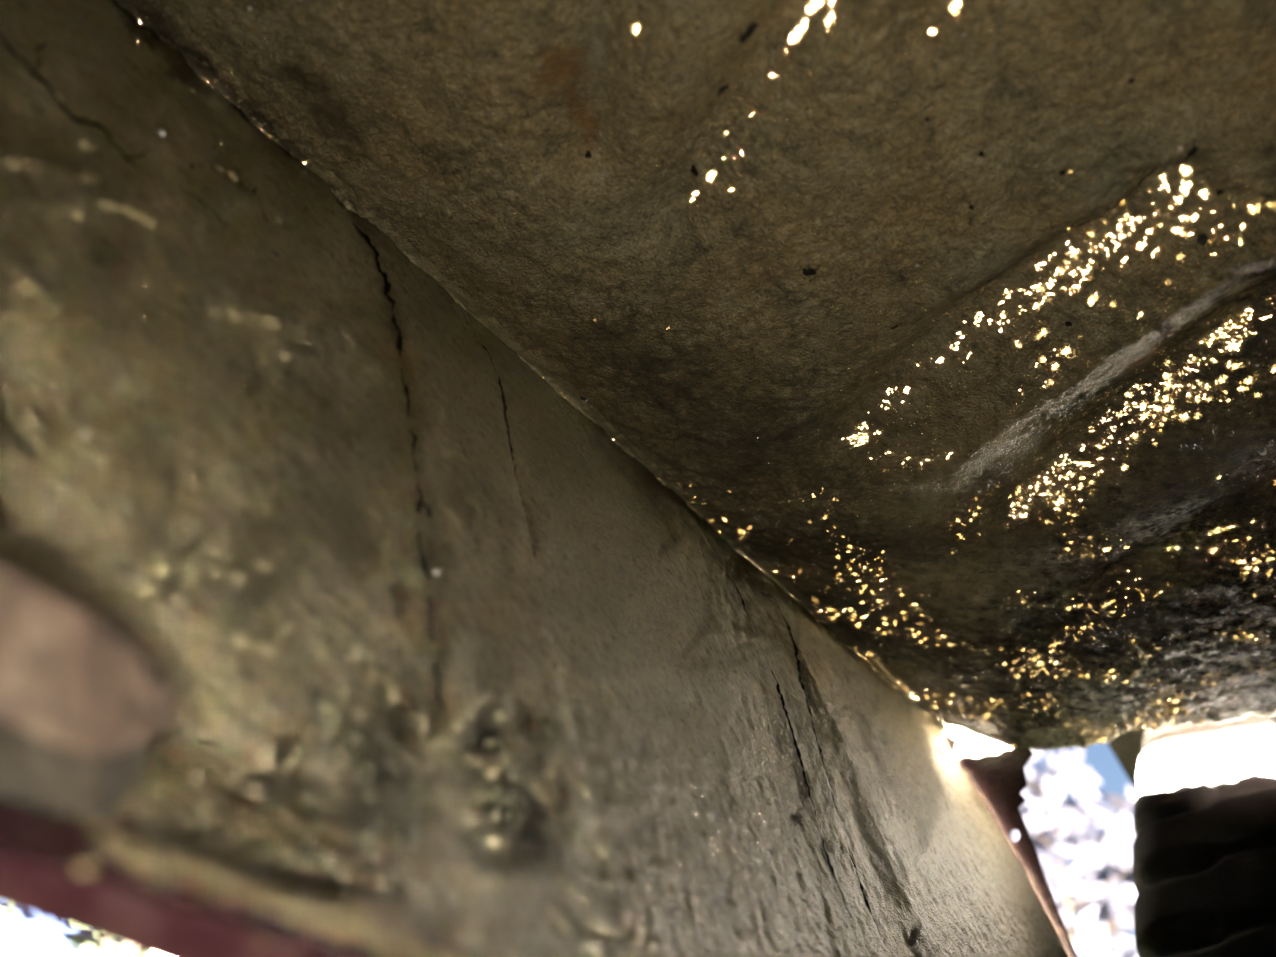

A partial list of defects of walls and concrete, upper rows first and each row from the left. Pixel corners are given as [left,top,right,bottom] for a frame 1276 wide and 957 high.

crack [352,220,444,713]
crack [462,311,591,790]
crack [726,573,893,956]